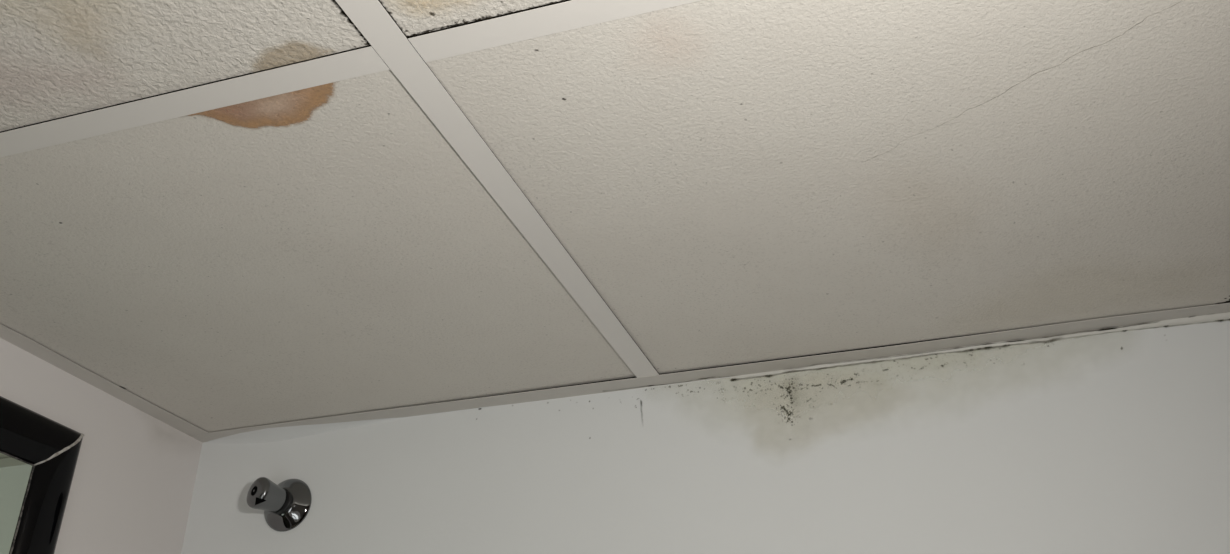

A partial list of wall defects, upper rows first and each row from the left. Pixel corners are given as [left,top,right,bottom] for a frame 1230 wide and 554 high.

leakage [188,83,333,128]
crack [864,0,1185,162]
leakage [897,335,1059,369]
leakage [731,365,858,422]